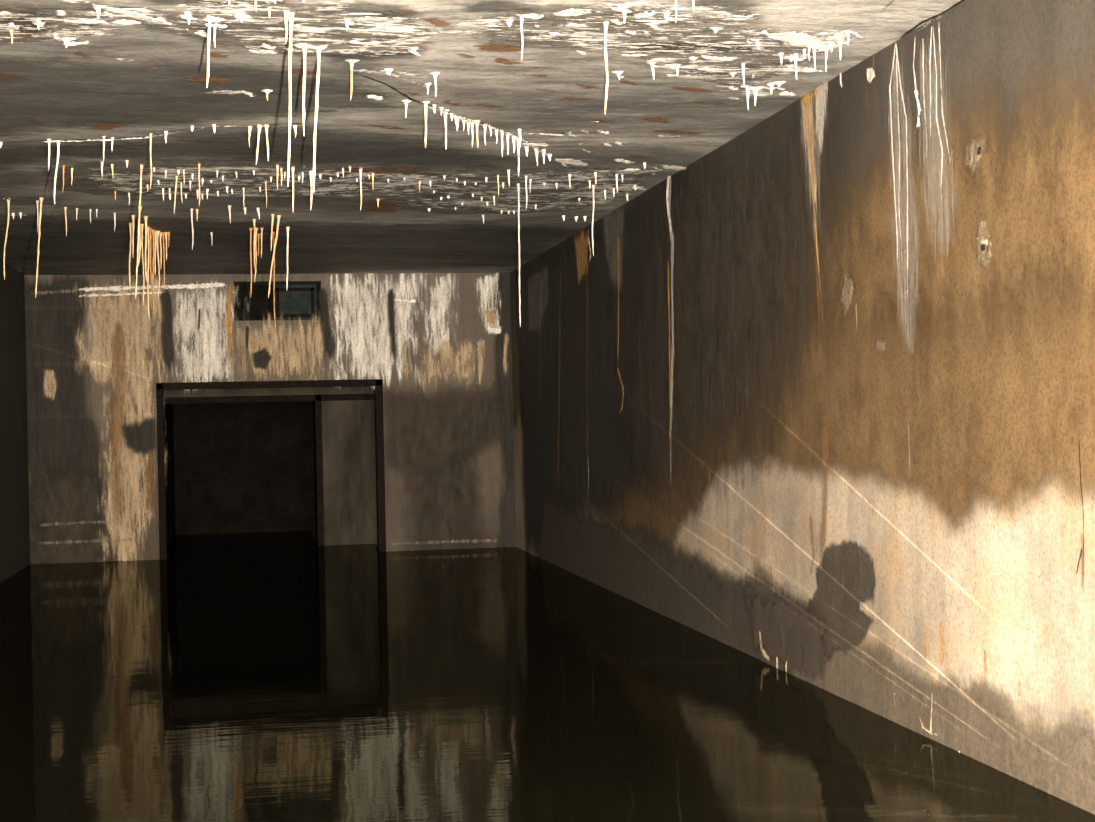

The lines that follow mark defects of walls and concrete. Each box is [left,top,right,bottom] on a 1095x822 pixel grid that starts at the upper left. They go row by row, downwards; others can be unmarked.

leakage [0,0,320,46]
leakage [246,44,333,54]
leakage [344,16,478,56]
leakage [498,1,682,39]
leakage [353,69,426,78]
leakage [0,131,499,165]
leakage [521,121,624,167]
leakage [0,221,570,367]
leakage [539,26,1095,815]